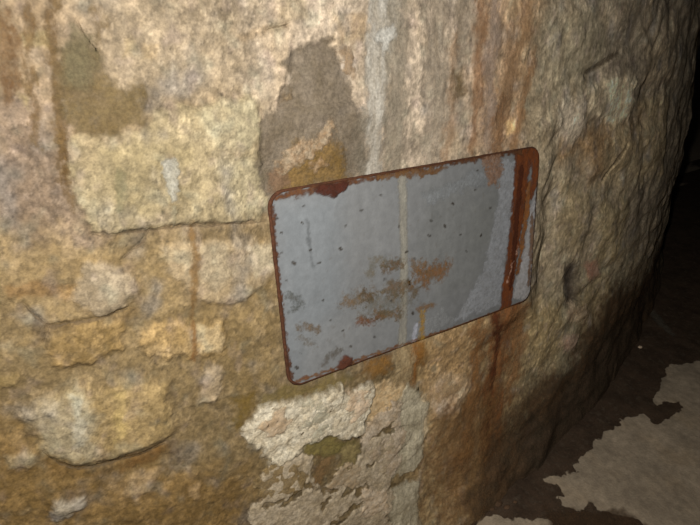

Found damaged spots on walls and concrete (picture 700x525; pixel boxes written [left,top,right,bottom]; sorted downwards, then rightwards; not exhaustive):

flaking render [242,379,407,525]
rust [271,47,539,525]